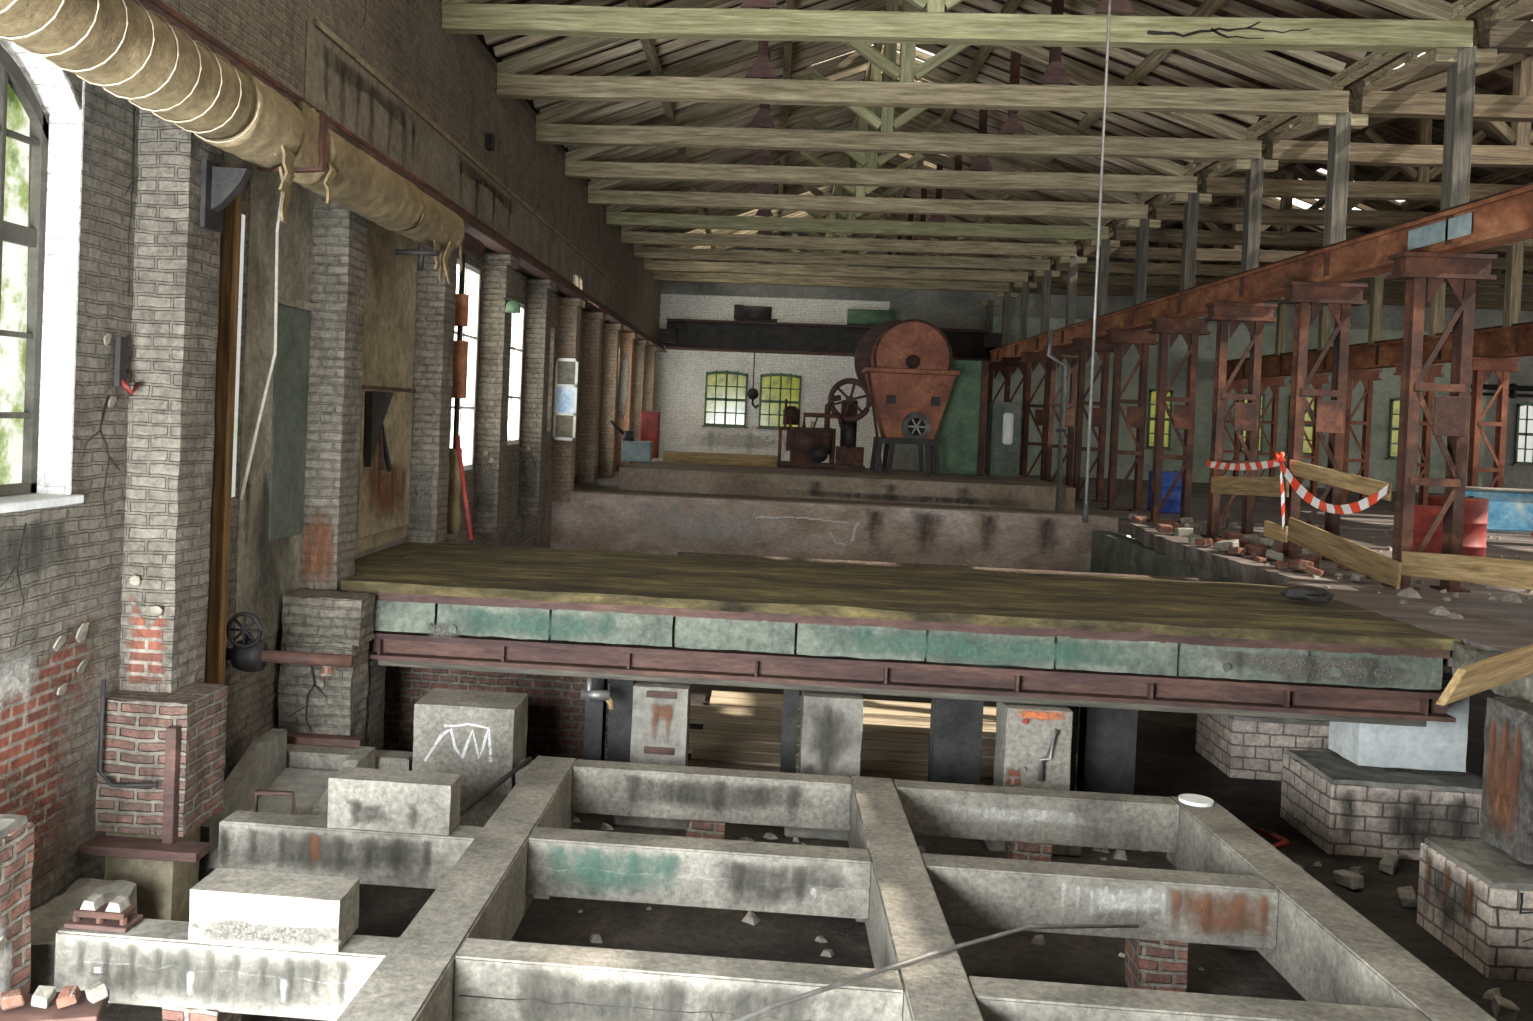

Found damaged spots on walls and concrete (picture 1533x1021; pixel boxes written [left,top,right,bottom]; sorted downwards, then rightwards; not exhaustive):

water stain [814,482,995,540]
flaking render [127,575,164,682]
water stain [0,662,29,696]
flaking render [0,622,89,861]
corrosion [654,707,672,725]
water stain [1344,794,1353,817]
water stain [531,849,845,900]